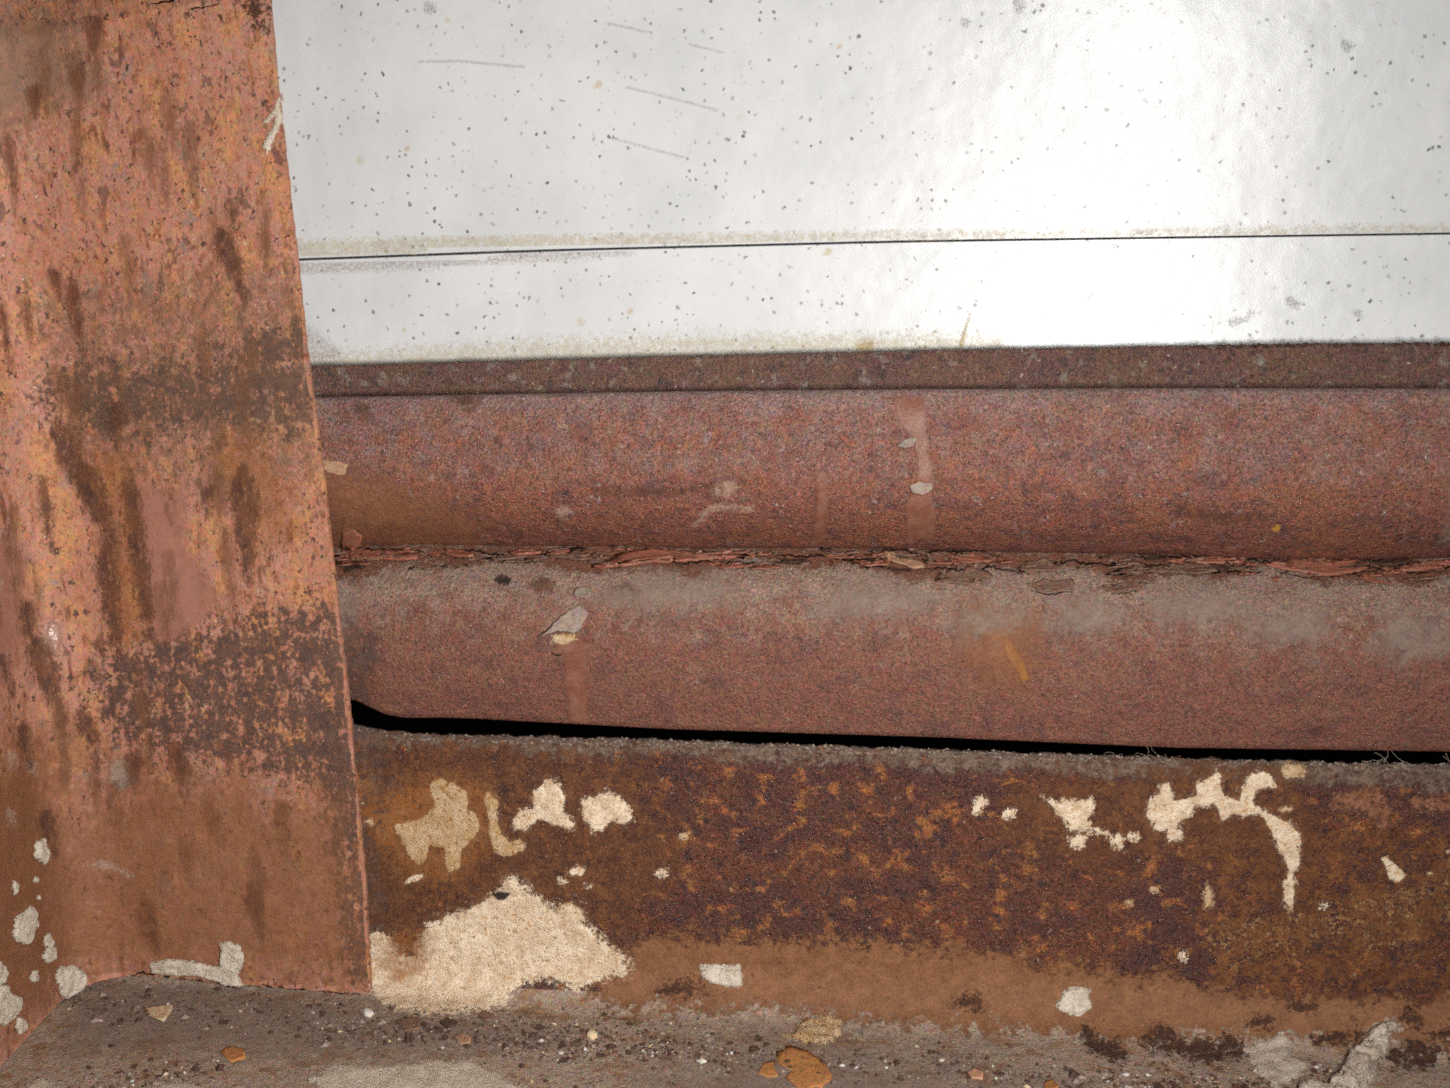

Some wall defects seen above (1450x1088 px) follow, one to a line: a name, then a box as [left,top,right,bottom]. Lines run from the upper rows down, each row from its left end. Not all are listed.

corrosion [70,17,103,98]
corrosion [4,138,16,195]
corrosion [215,227,248,300]
peeling [591,548,770,597]
peeling [853,551,925,569]
peeling [539,587,591,645]
corrosion [0,271,1450,1075]
peeling [971,795,1018,821]
peeling [1043,760,1307,915]
peeling [369,776,636,1045]
peeling [143,1004,174,1022]
corrosion [758,1060,778,1079]